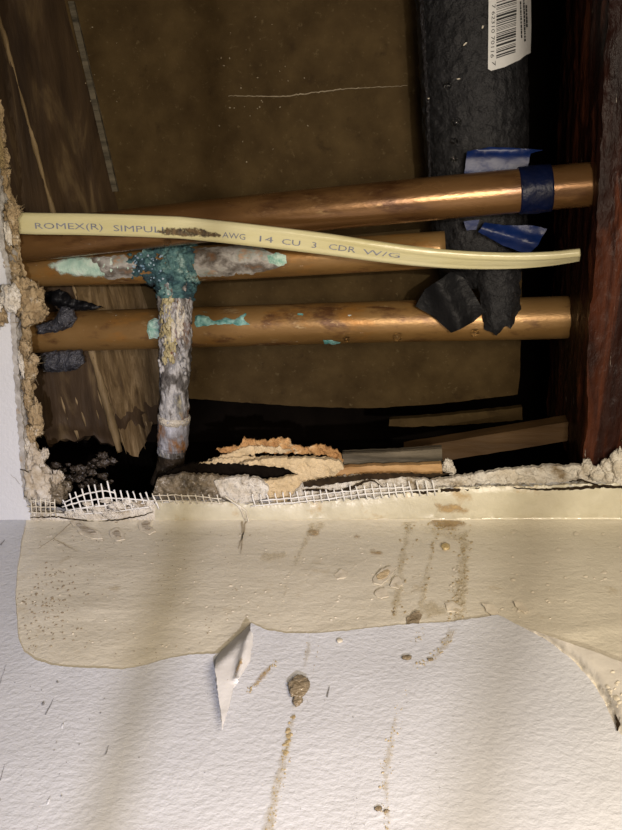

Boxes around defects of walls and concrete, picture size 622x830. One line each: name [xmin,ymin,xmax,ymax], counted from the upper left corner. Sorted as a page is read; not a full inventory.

spalling [0,100,27,286]
peeling [10,313,622,669]
damp [265,715,296,830]